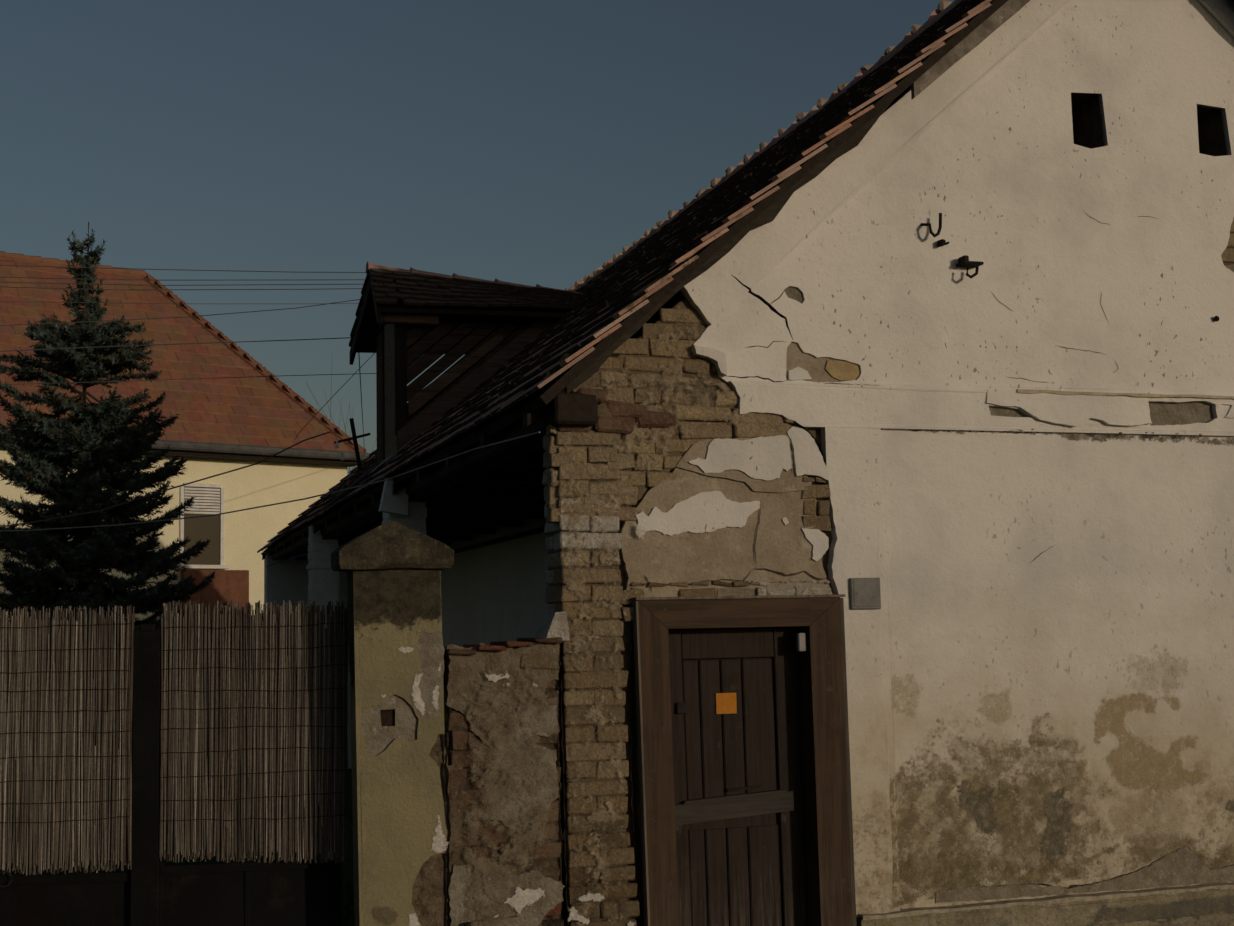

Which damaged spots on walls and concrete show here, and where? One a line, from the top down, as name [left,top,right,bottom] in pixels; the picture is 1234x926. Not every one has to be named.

spalling [1221,219,1234,272]
crack [732,275,793,348]
spalling [784,287,804,304]
crack [725,375,783,383]
spalling [786,342,860,382]
flaking render [986,389,1234,427]
spalling [360,302,832,926]
water stain [890,693,1234,908]
water stain [1096,896,1234,923]